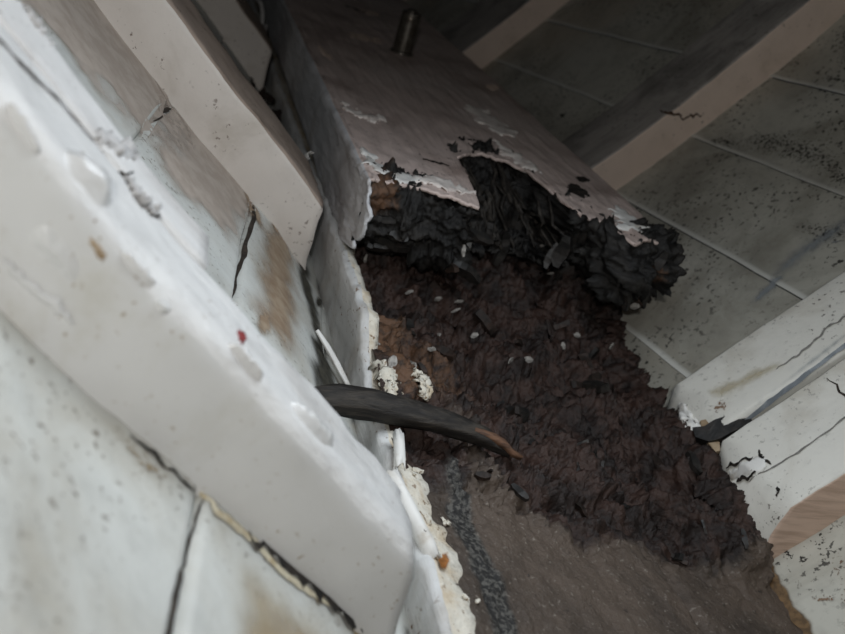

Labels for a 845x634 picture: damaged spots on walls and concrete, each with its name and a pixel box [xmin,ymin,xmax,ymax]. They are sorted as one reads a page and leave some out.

crack [660,110,704,121]
crack [232,205,256,297]
spalling [351,104,803,634]
crack [749,417,845,497]
crack [130,435,363,634]